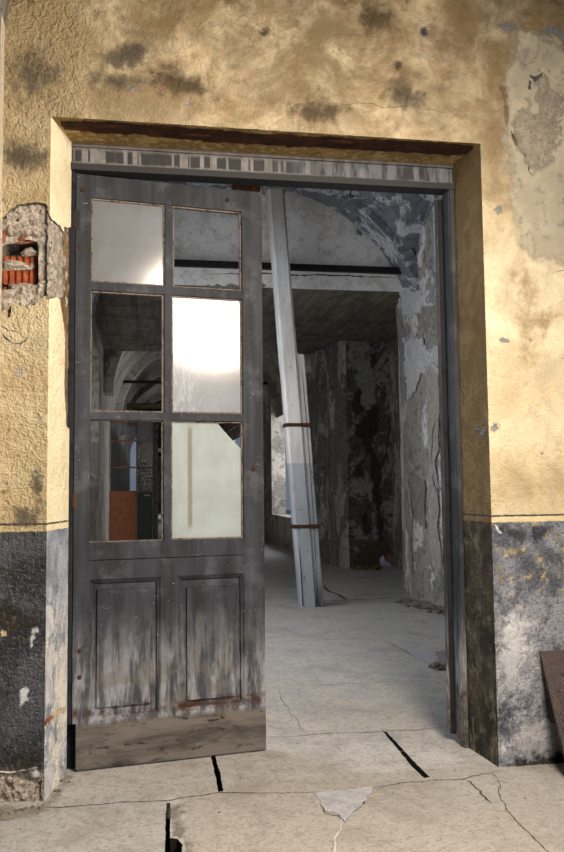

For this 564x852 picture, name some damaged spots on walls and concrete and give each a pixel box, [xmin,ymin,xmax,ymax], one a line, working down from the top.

damp [94,44,145,87]
damp [155,73,205,94]
rust [60,121,474,156]
damp [292,103,339,122]
flaking render [499,23,564,263]
spalling [0,204,69,423]
peeling [399,287,437,319]
crack [406,474,414,578]
peeling [402,334,442,579]
crack [431,414,442,575]
crack [57,792,246,844]
crack [320,773,549,852]